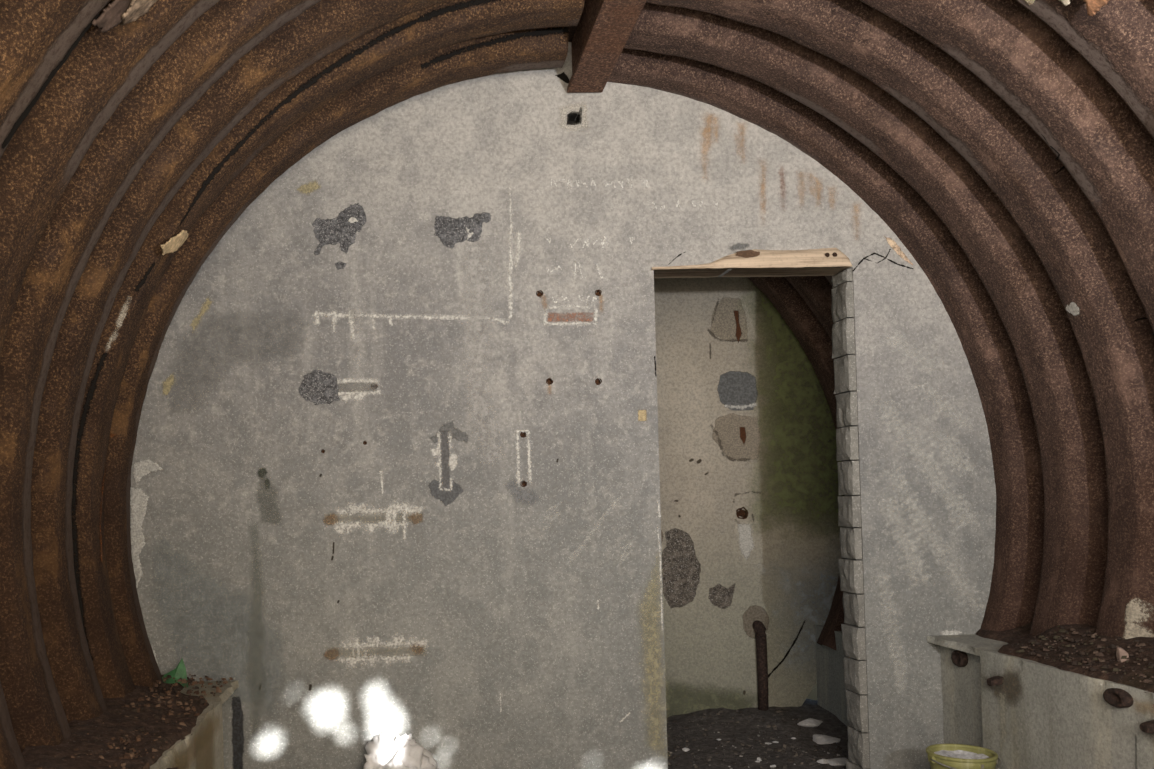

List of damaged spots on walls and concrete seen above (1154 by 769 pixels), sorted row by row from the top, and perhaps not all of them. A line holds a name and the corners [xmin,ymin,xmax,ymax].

spalling [312,203,366,270]
spalling [434,212,491,248]
crack [853,249,913,271]
spalling [298,370,380,405]
spalling [662,528,735,609]